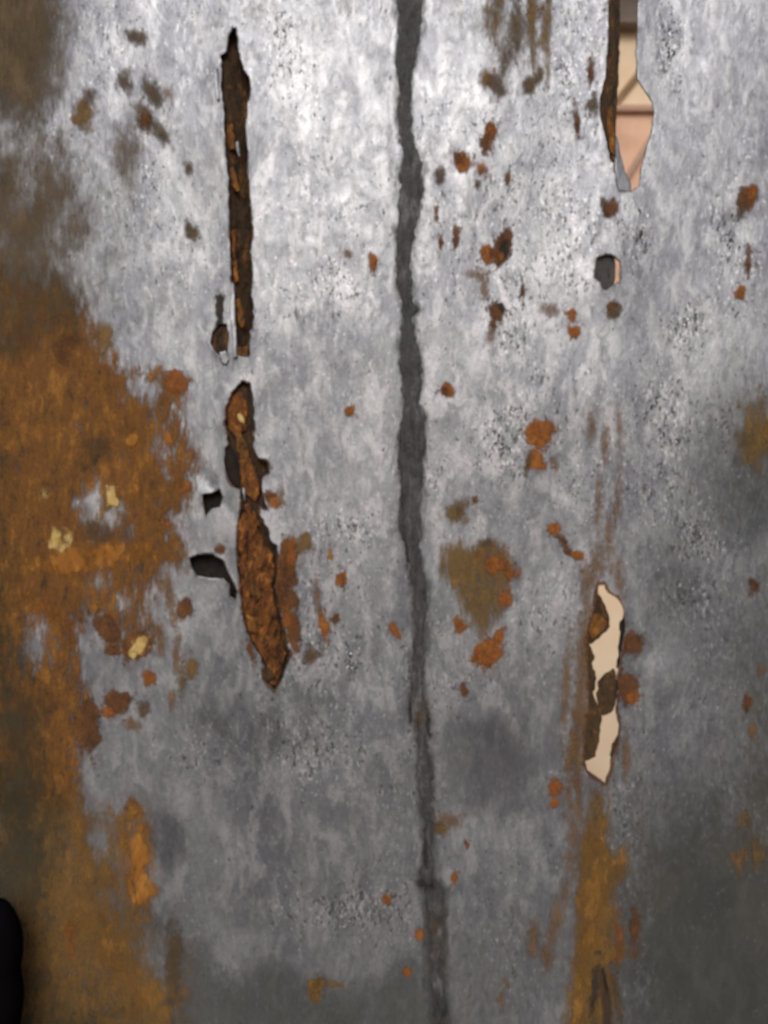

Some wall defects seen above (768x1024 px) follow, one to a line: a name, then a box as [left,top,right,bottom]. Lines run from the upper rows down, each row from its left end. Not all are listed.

rust [220,26,254,288]
peeling [607,111,615,155]
rust [434,202,462,252]
rust [468,219,513,341]
rust [542,303,583,339]
rust [594,253,622,319]
rust [521,417,562,477]
rust [0,272,283,1024]
rust [274,532,340,664]
rust [327,549,347,586]
rust [440,539,520,673]
rust [528,481,645,1024]